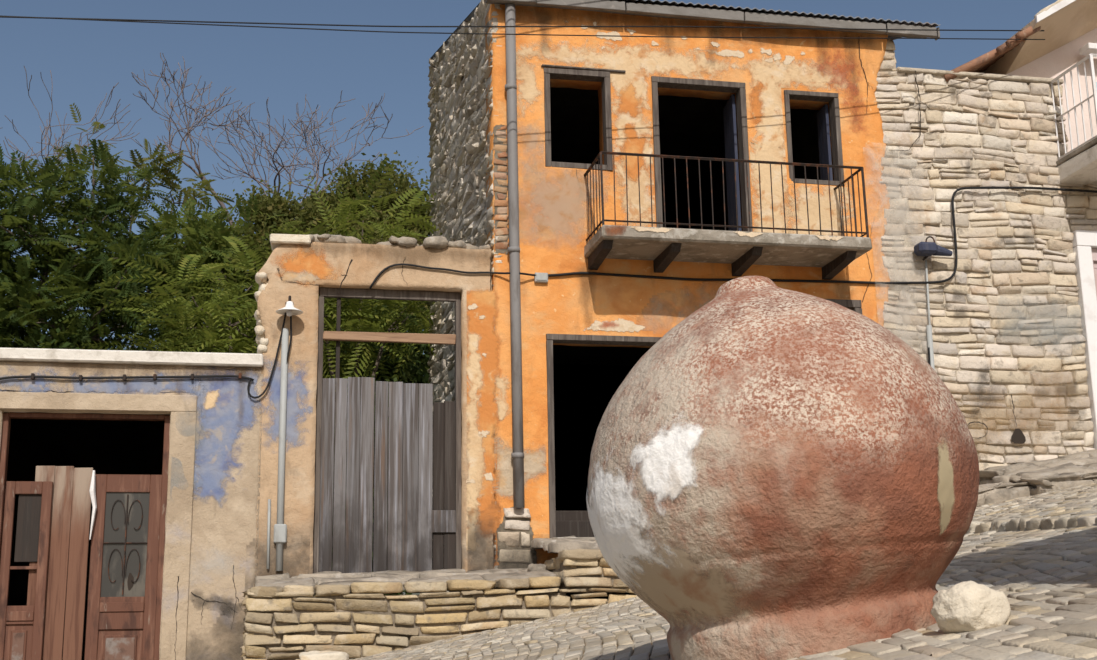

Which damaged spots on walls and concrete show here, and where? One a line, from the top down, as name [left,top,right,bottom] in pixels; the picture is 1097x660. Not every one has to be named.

peeling [516,22,857,241]
peeling [204,390,219,409]
peeling [254,249,336,354]
peeling [466,334,547,550]